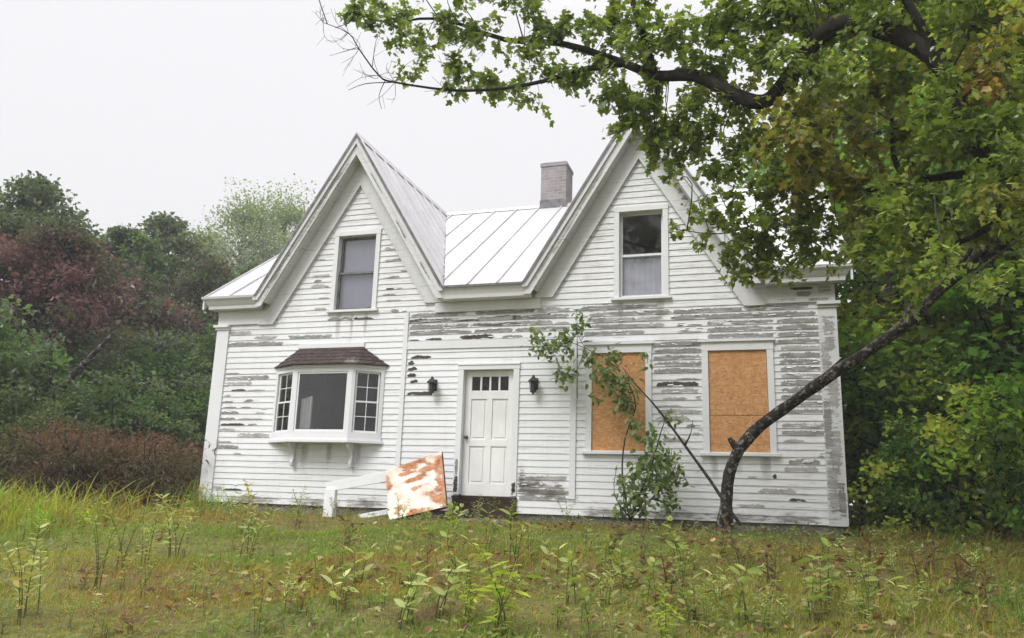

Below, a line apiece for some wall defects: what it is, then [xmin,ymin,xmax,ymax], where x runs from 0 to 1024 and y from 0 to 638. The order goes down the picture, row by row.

peeling [228,331,332,346]
peeling [311,274,373,321]
peeling [217,373,269,455]
peeling [383,247,847,523]